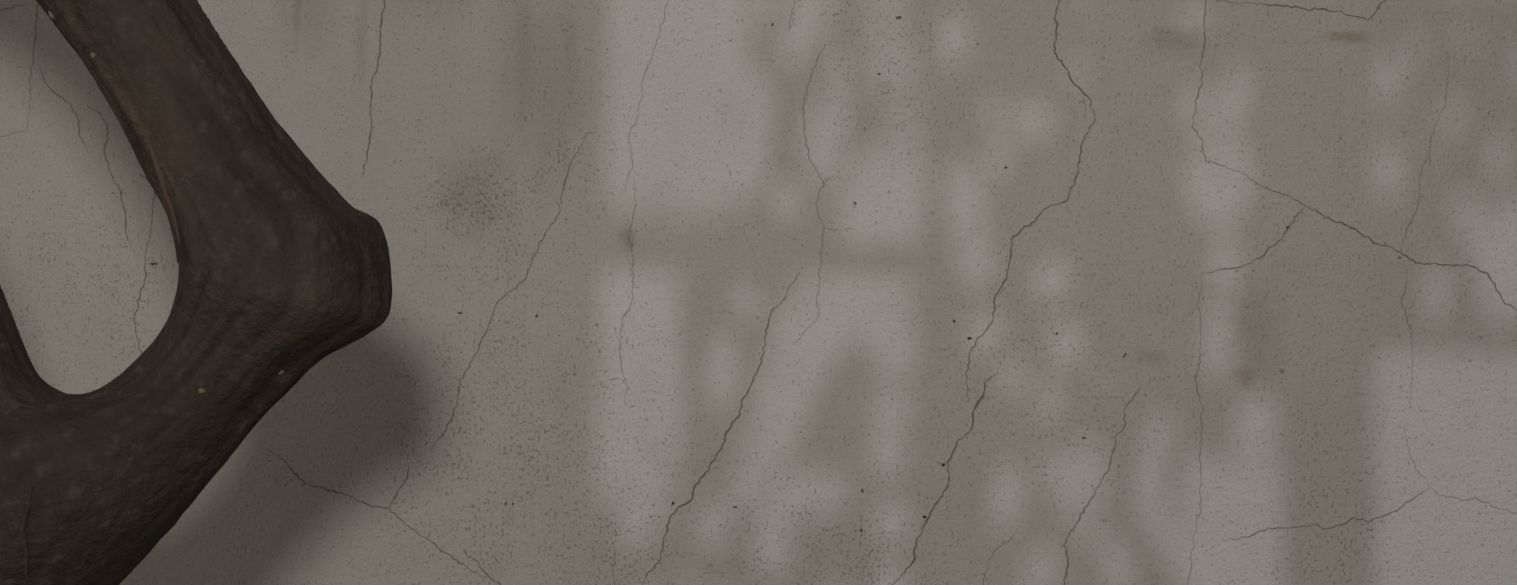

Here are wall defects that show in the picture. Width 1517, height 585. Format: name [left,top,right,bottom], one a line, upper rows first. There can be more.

crack [268,0,668,585]
crack [612,43,853,585]
crack [892,0,1095,585]
crack [1187,0,1517,585]